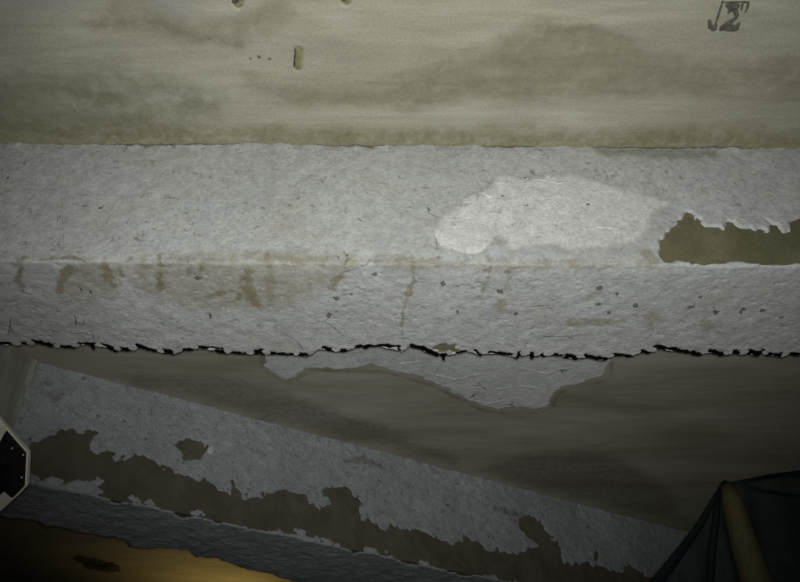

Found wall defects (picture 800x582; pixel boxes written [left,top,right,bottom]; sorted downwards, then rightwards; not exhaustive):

spalling [659,210,800,267]
peeling [0,339,800,365]
spalling [28,428,652,582]